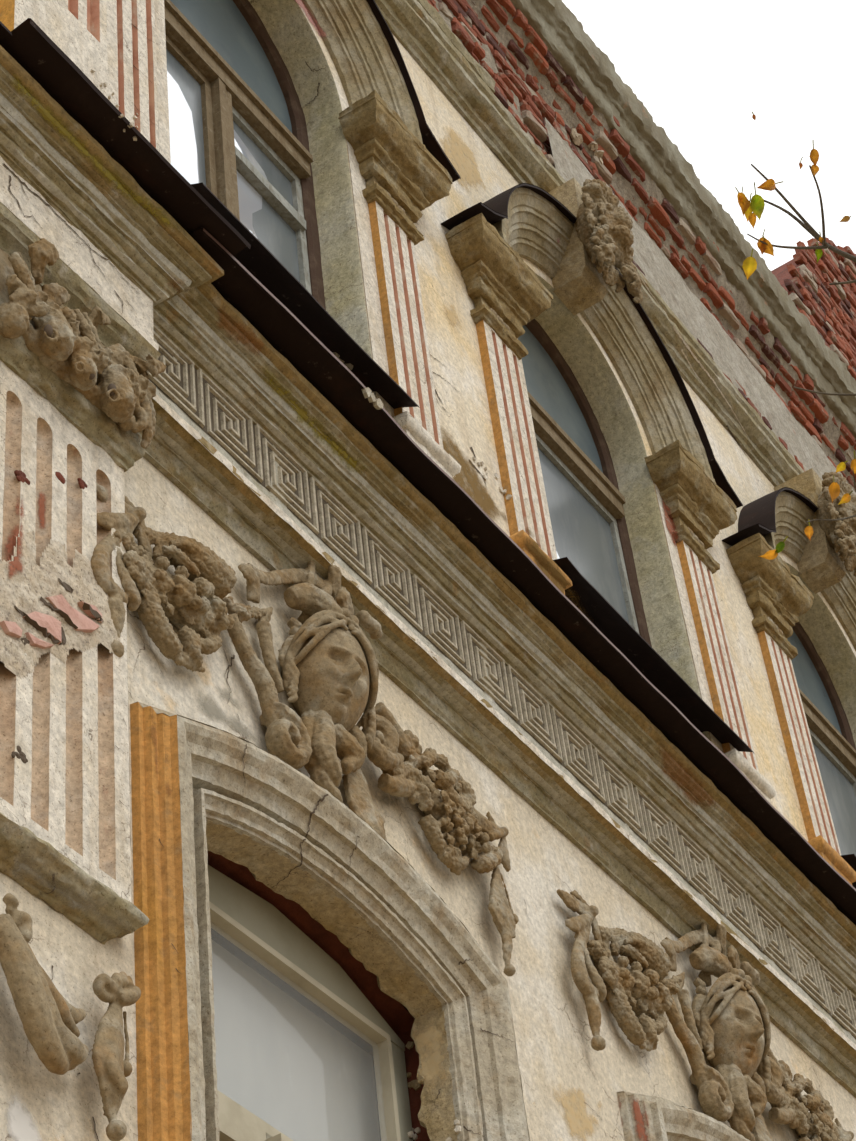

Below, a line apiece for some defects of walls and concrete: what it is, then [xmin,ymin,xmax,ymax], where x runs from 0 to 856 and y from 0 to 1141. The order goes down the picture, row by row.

flaking render [427,0,856,488]
spalling [14,470,30,485]
spalling [55,472,87,489]
spalling [0,530,120,679]
crack [267,794,328,890]